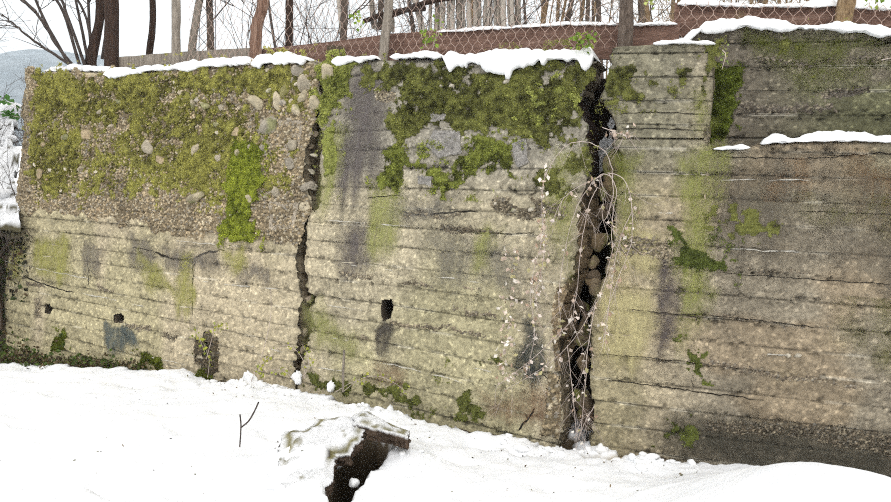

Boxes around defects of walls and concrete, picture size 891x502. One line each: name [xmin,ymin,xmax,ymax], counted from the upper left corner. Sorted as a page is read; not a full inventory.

crack [327,45,345,59]
crack [308,124,324,203]
damp [322,74,383,203]
damp [104,321,137,352]
crack [133,247,224,308]
crack [299,243,329,365]
damp [330,189,415,275]
crack [519,79,755,446]